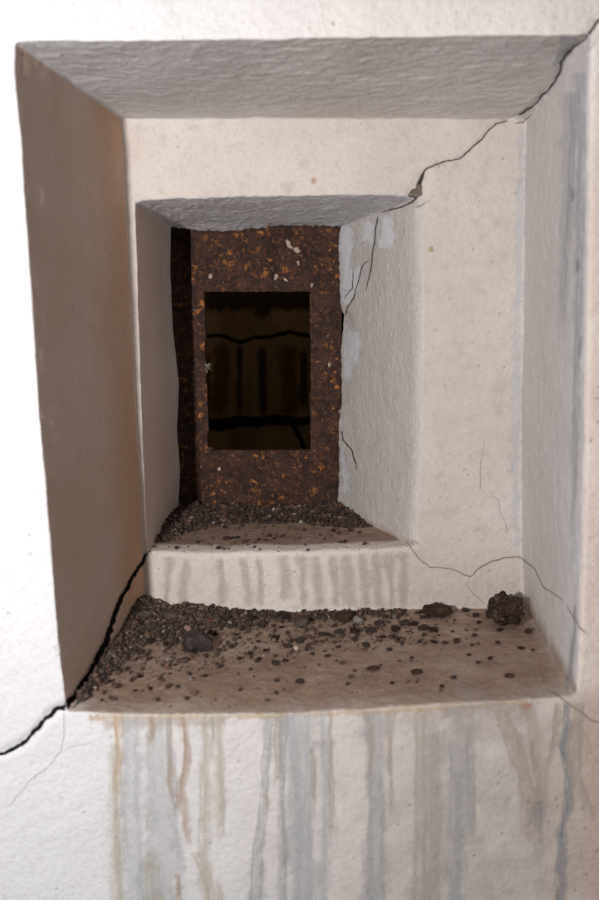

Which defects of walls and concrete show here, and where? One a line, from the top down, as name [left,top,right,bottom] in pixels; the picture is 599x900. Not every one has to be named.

crack [343,19,599,315]
crack [0,549,151,807]
crack [405,542,586,633]